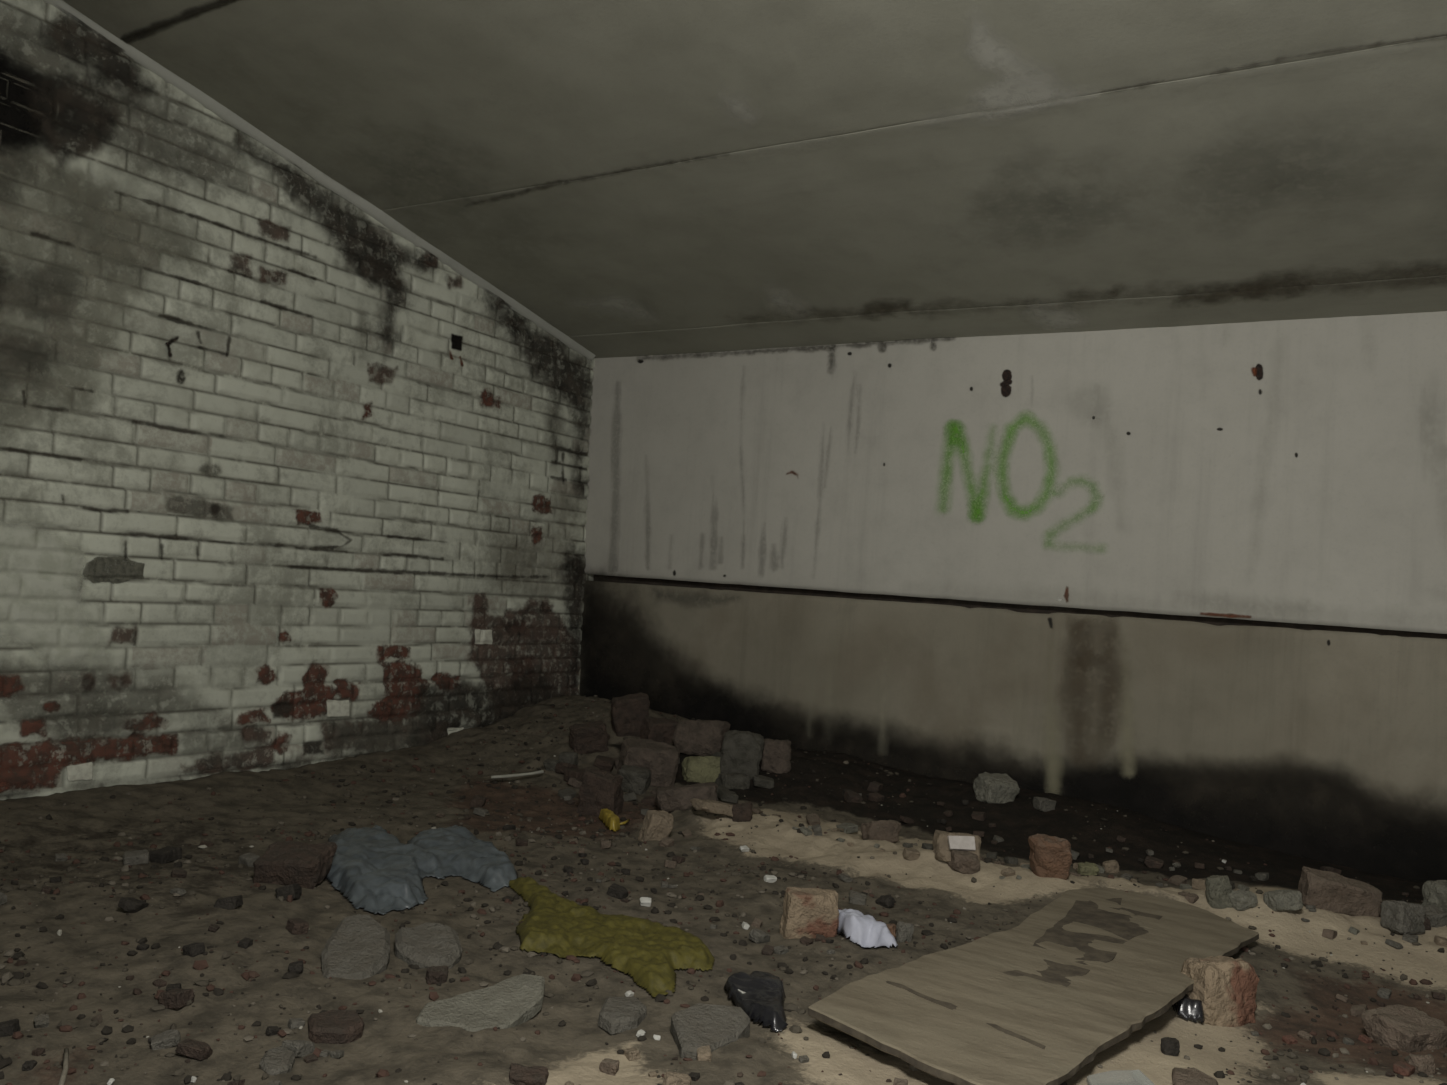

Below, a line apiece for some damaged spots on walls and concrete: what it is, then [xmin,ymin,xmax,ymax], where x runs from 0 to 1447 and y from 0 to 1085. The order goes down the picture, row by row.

crack [121,0,235,44]
crack [1218,35,1447,72]
damp [0,15,233,419]
damp [238,134,426,344]
crack [482,169,631,202]
damp [491,297,593,491]
peeling [0,701,178,793]
peeling [111,627,137,643]
peeling [192,645,460,774]
peeling [320,588,338,608]
peeling [469,593,580,717]
damp [330,555,1447,882]